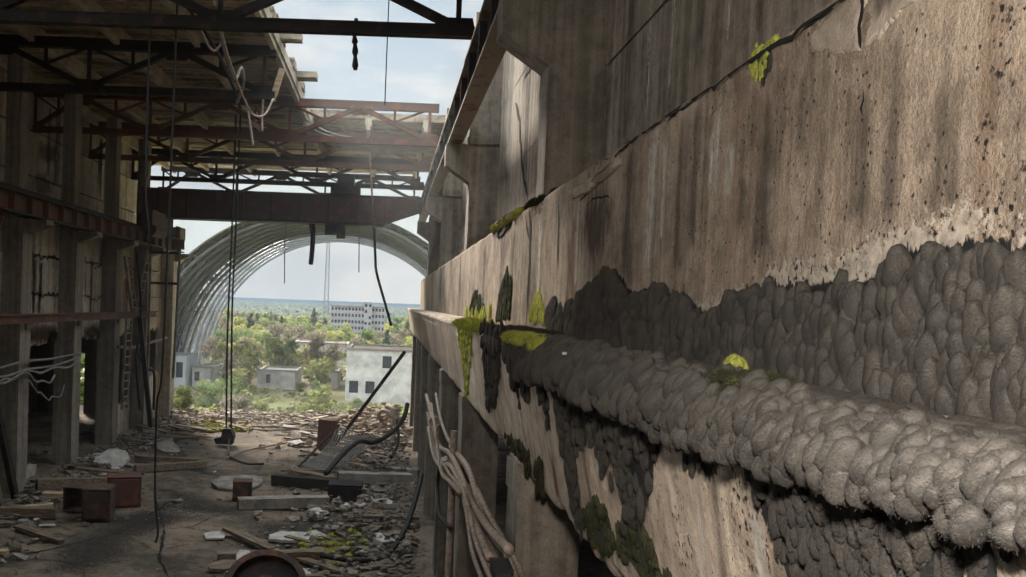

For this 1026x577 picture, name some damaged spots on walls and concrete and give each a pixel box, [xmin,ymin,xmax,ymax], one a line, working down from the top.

crack [592,0,864,166]
flaking render [790,0,915,55]
leakage [693,161,1026,311]
leakage [732,467,782,577]